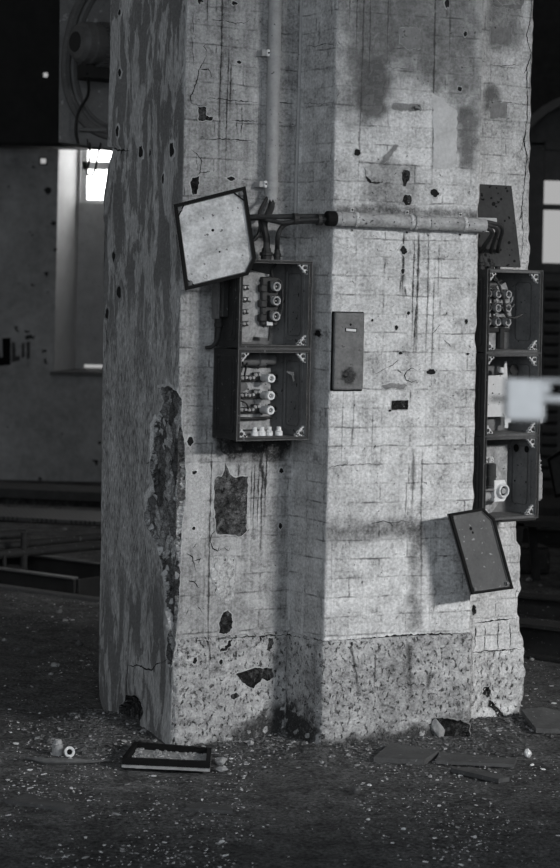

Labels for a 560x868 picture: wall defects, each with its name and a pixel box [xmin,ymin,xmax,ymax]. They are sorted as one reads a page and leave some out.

damp [348,0,477,118]
crack [190,20,257,176]
damp [486,87,499,109]
damp [458,109,478,167]
spalling [143,382,198,668]
spalling [212,462,249,537]
peeling [210,555,236,666]
spalling [118,694,144,725]
crack [126,659,167,690]
spalling [229,667,274,700]